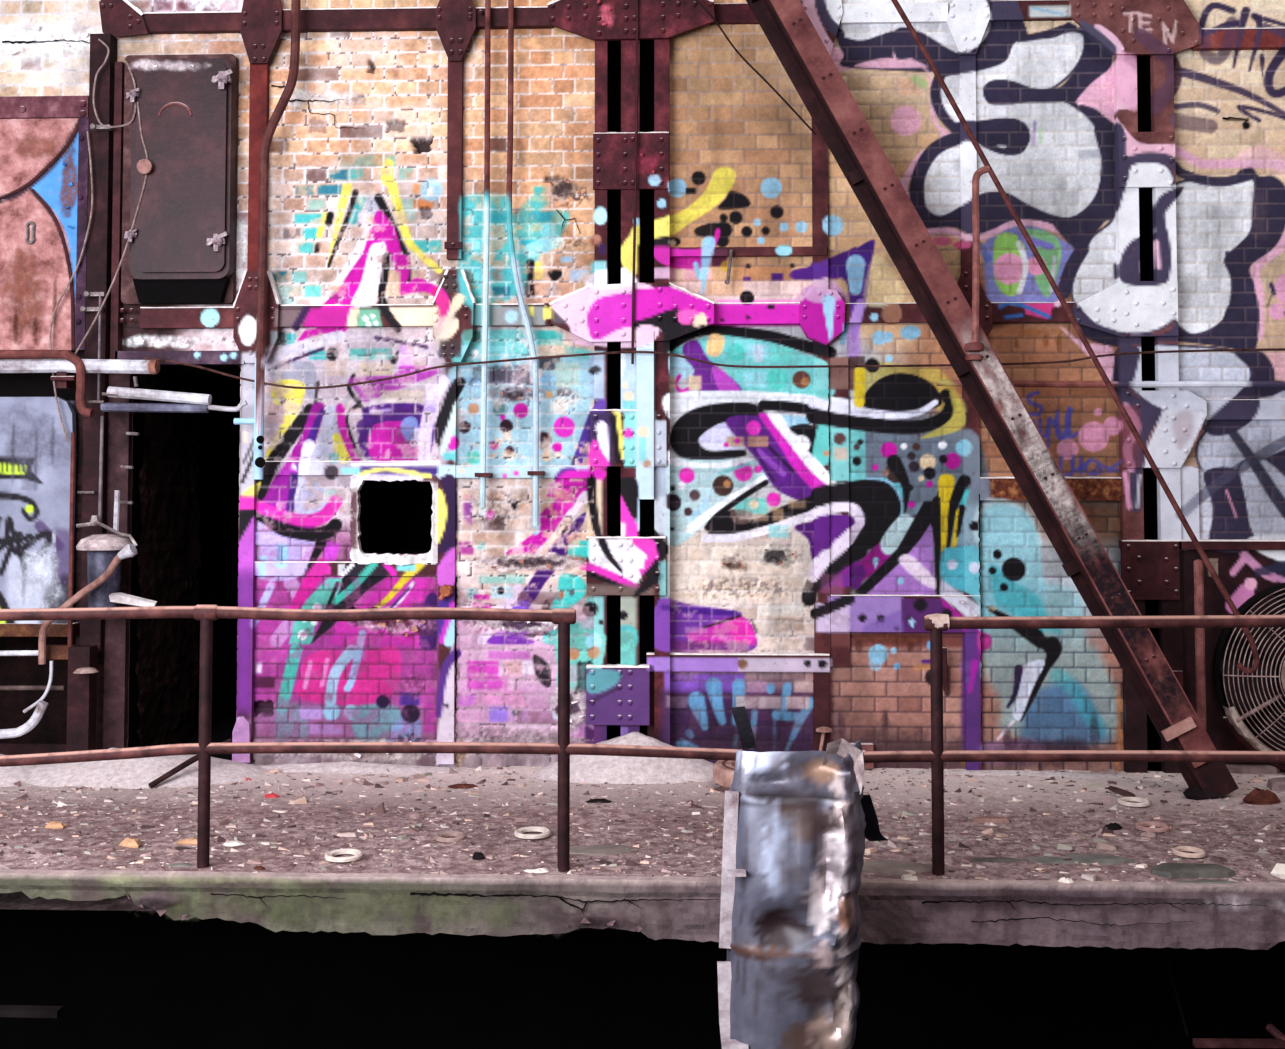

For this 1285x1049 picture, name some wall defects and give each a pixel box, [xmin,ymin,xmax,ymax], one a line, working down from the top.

rust [855,633,923,651]
rust [1115,699,1123,771]